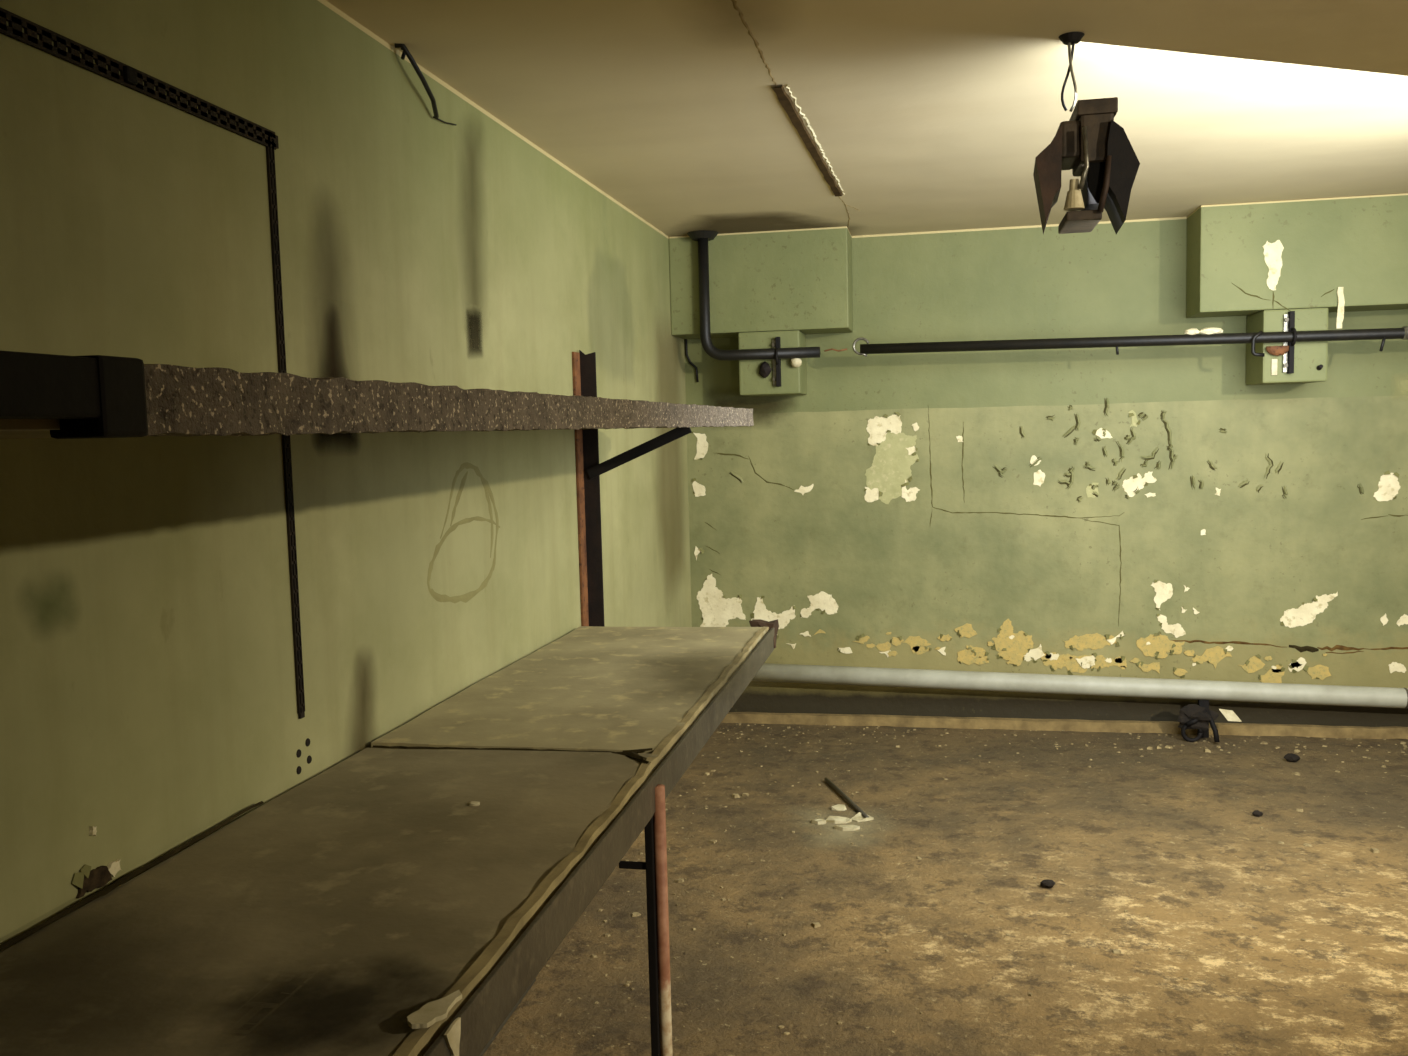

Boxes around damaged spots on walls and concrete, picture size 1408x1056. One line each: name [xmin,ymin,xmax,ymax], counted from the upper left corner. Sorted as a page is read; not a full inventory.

peeling [1263,240,1284,290]
peeling [1092,428,1113,439]
peeling [1128,410,1140,427]
peeling [864,412,919,504]
peeling [1030,455,1045,486]
peeling [1086,483,1099,498]
peeling [1122,471,1157,498]
peeling [1374,471,1401,501]
peeling [697,574,839,649]
peeling [838,580,1338,683]
peeling [1380,613,1408,626]
peeling [1389,662,1406,673]